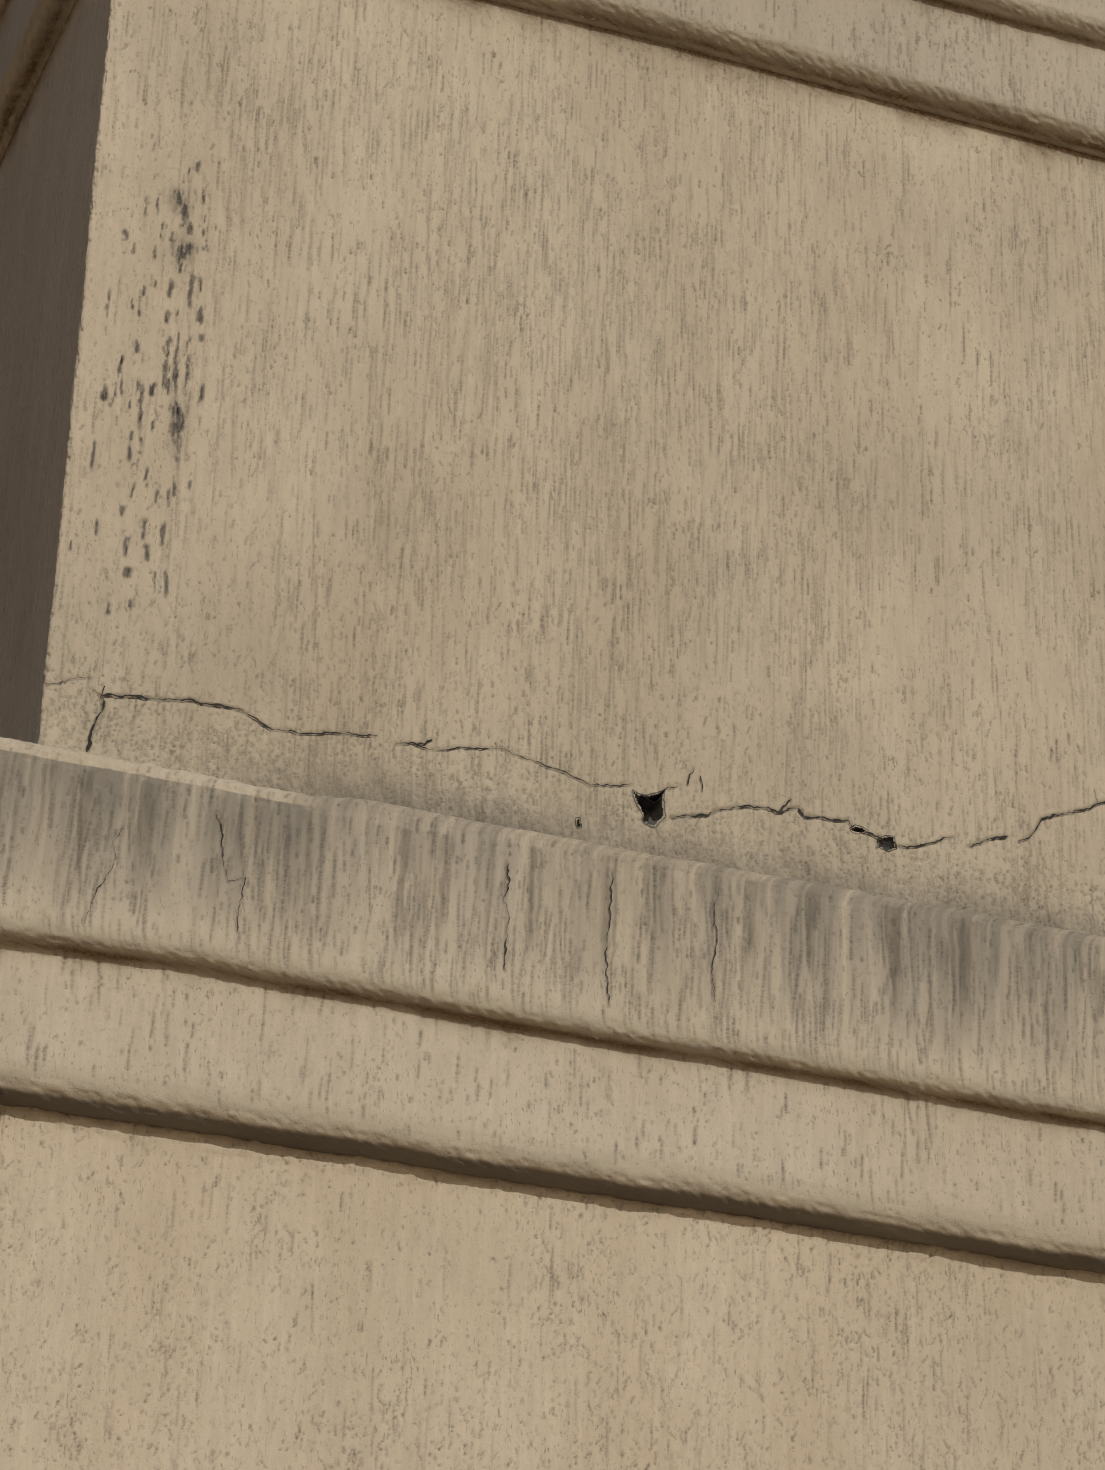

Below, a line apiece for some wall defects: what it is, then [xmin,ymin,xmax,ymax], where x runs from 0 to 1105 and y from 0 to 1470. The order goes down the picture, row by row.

damp [928,0,1090,41]
damp [671,43,1105,162]
damp [102,192,205,459]
damp [124,521,165,576]
crack [51,677,628,787]
spalling [632,789,667,828]
crack [663,768,1105,848]
crack [216,814,246,931]
damp [17,943,145,962]
damp [291,985,684,1055]
damp [936,1097,1105,1127]